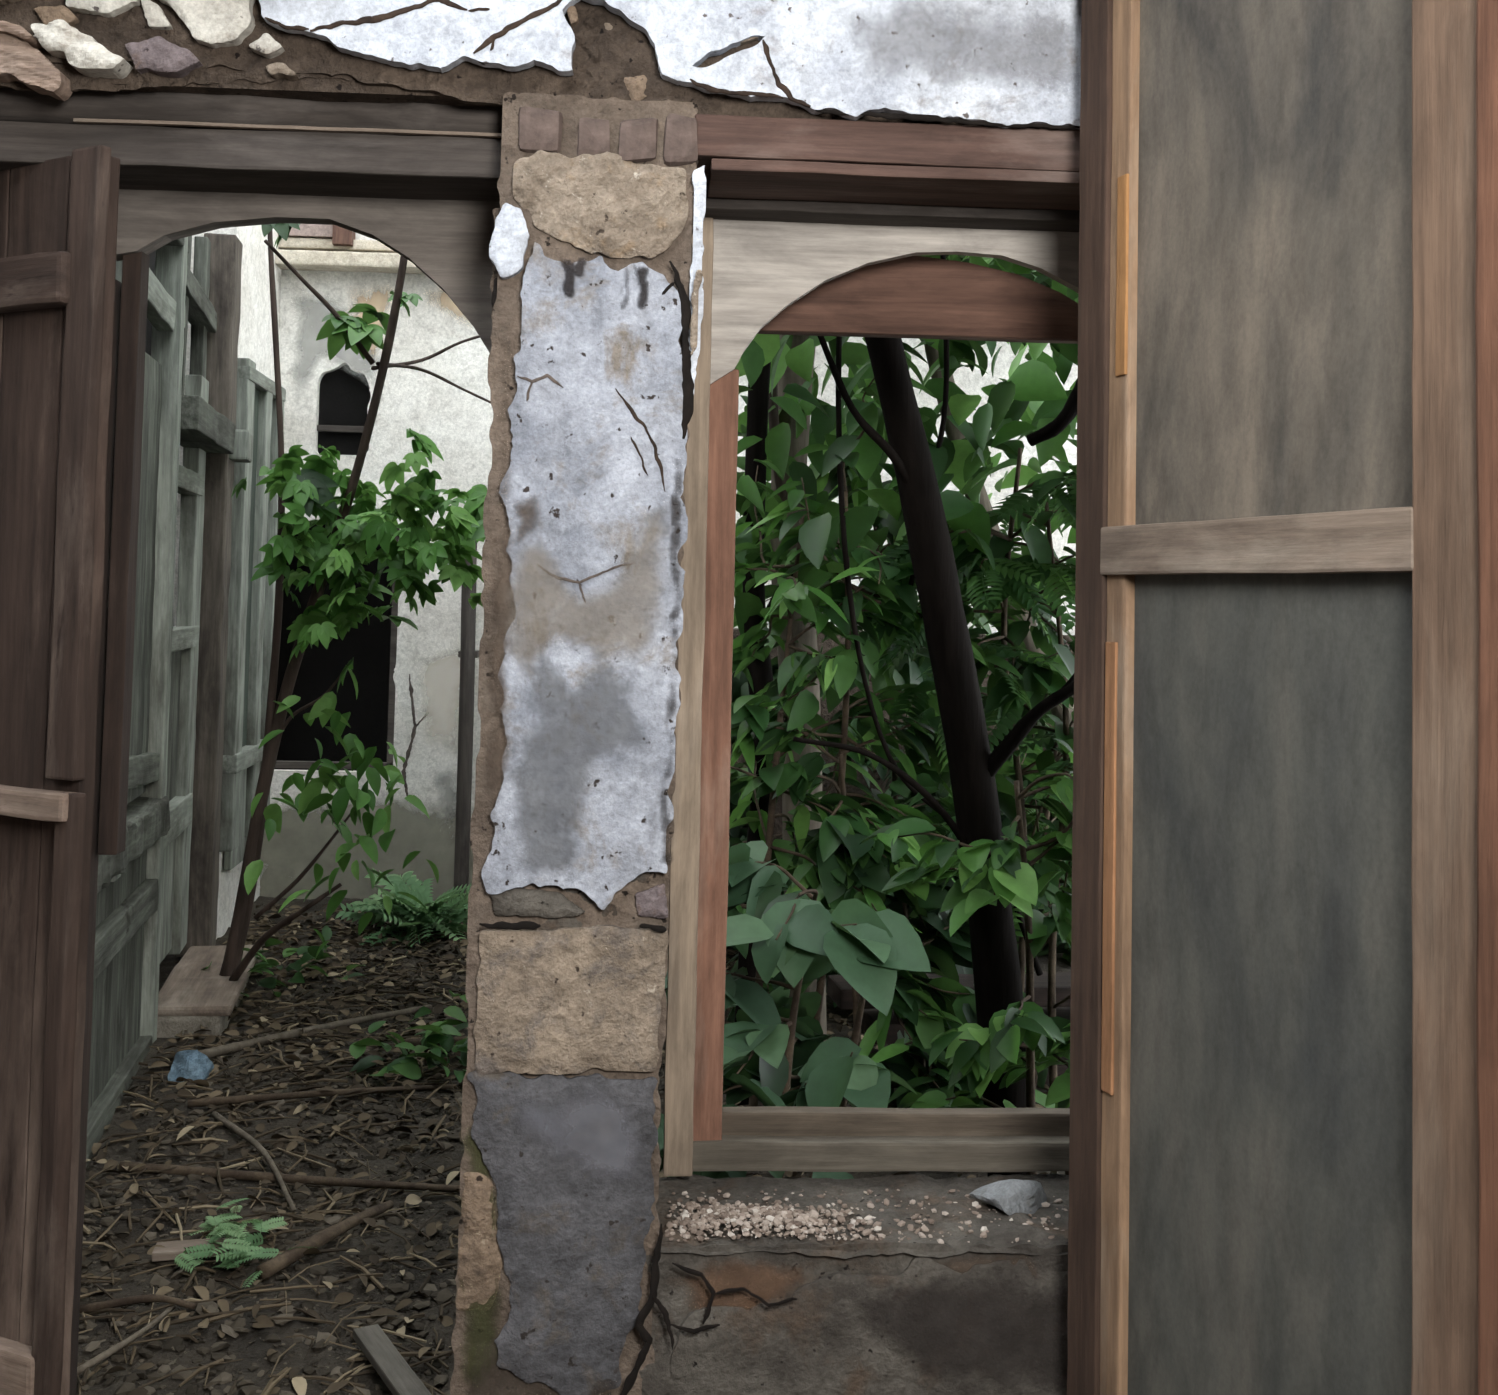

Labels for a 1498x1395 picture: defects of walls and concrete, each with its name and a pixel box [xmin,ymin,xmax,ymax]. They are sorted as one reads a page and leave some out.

spalling [0,0,353,101]
crack [265,0,562,54]
spalling [567,0,613,91]
spalling [624,73,674,101]
crack [517,374,563,401]
crack [551,562,635,604]
crack [620,1224,797,1395]